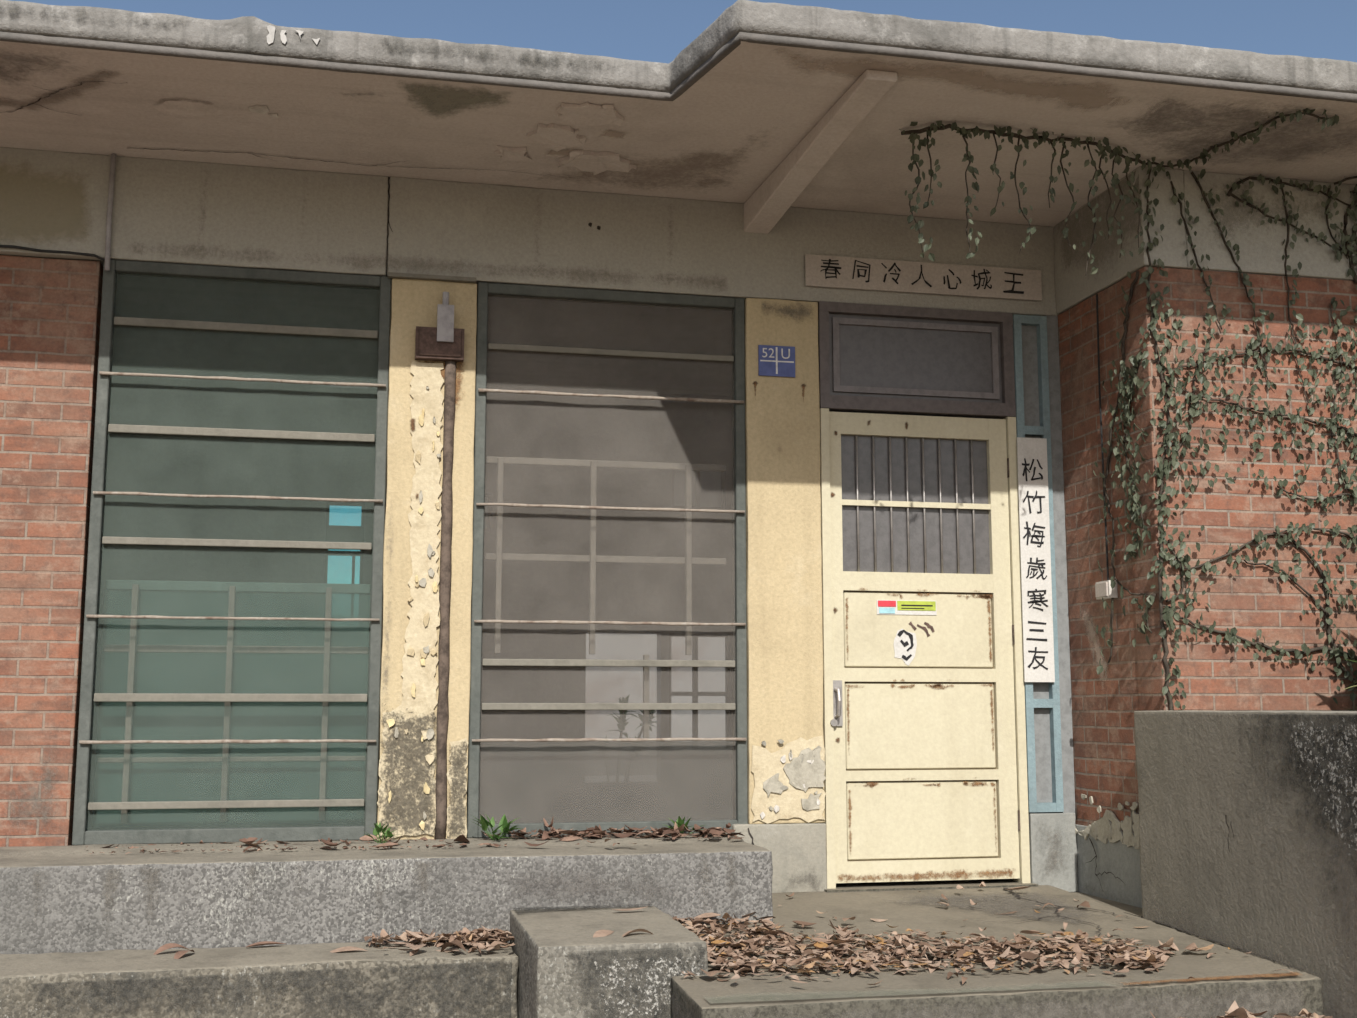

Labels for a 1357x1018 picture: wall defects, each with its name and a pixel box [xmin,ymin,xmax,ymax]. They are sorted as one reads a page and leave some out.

spalling [267,25,320,45]
crack [135,148,580,268]
peeling [377,361,468,840]
corrosion [958,594,993,659]
peeling [751,736,826,824]
flaking render [1075,794,1140,849]
water stain [1243,714,1357,918]
corrosion [839,869,1012,881]